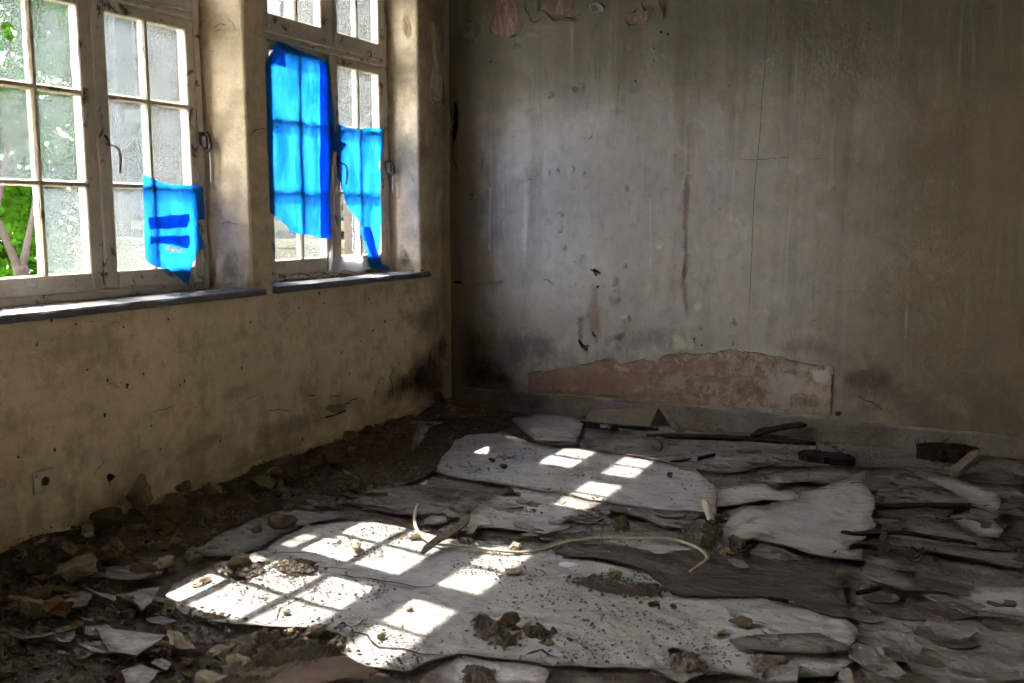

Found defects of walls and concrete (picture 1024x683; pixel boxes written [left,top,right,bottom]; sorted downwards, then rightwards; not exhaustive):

peeling [488,0,525,42]
rust [678,120,692,326]
crack [740,8,822,318]
flaking render [524,336,843,417]